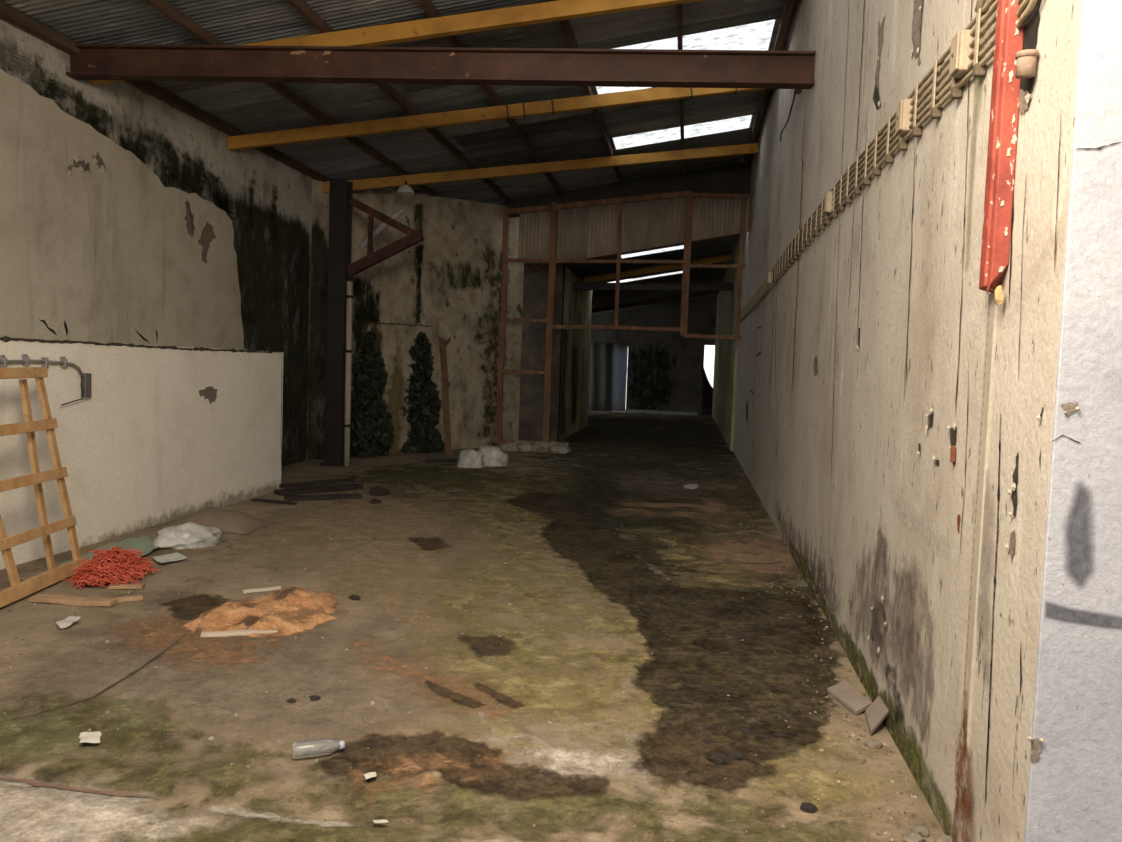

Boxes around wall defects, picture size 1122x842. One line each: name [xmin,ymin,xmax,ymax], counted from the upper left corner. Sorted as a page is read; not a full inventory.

spalling [873,13,885,109]
spalling [909,0,923,65]
spalling [1014,0,1040,50]
spalling [1008,70,1033,123]
flaking render [67,151,107,177]
water stain [0,40,328,466]
flaking render [183,195,216,268]
water stain [474,248,510,446]
peeling [199,386,218,404]
spalling [917,407,939,466]
corrosion [952,693,973,842]